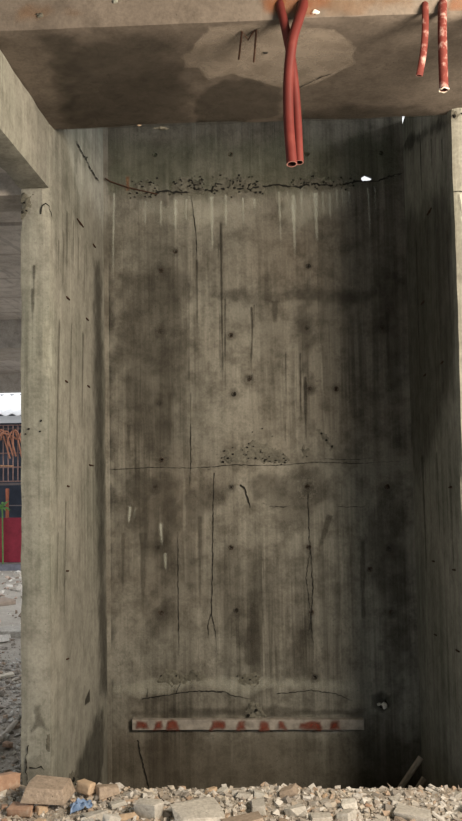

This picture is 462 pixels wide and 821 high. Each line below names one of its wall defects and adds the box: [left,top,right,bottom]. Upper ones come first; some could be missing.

crack [142,685,248,700]